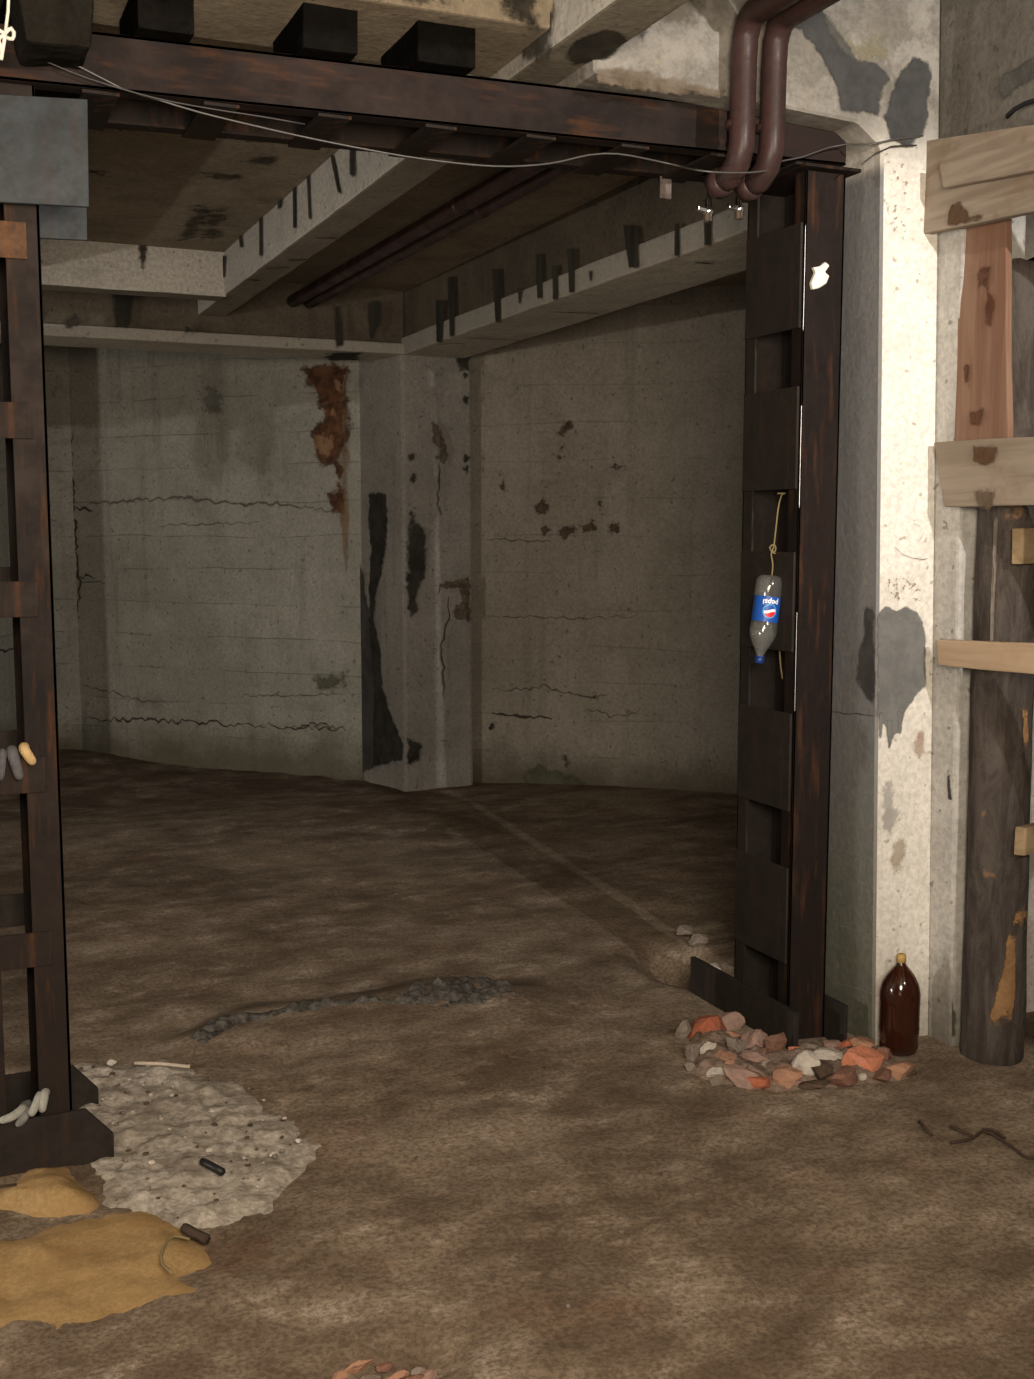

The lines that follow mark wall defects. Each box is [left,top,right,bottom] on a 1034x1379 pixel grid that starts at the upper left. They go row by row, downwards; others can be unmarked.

leakage [503,0,555,62]
leakage [568,30,725,98]
rust [300,362,351,559]
crack [71,438,342,619]
leakage [406,511,427,617]
leakage [313,492,422,772]
crack [81,684,345,731]